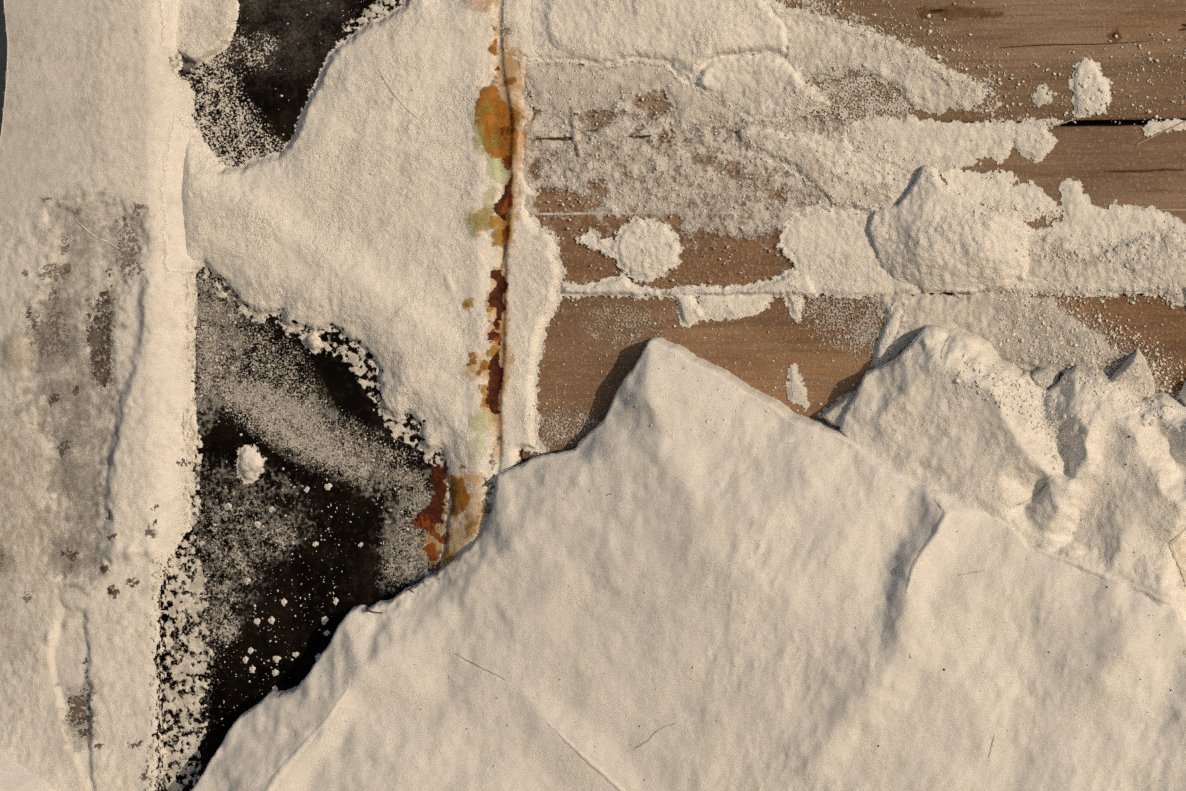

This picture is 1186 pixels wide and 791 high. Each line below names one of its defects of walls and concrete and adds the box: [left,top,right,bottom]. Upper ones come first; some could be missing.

flaking render [159,0,240,66]
rust [411,17,527,574]
flaking render [303,330,324,355]
flaking render [272,652,299,691]